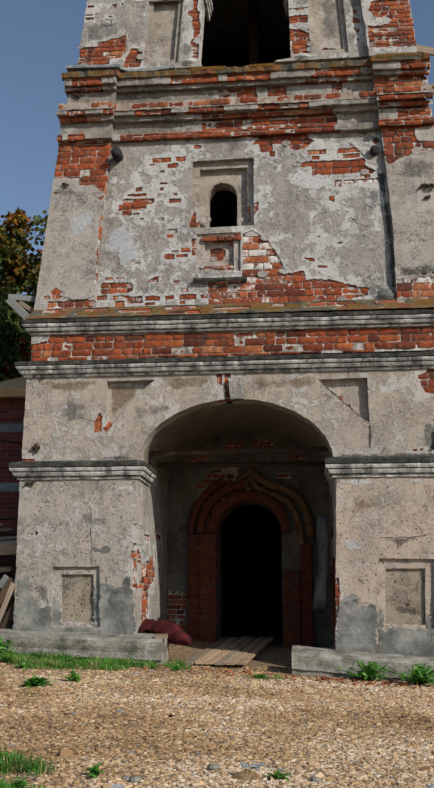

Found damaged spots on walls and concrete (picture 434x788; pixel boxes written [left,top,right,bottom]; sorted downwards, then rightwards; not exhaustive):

spalling [78,36,147,68]
spalling [188,0,201,59]
spalling [288,7,334,55]
spalling [352,0,416,48]
spalling [54,60,434,200]
flaking render [118,187,154,219]
spalling [44,202,434,316]
spalling [31,326,434,361]
spalling [418,369,434,394]
crack [319,380,373,443]
spalling [331,558,340,648]